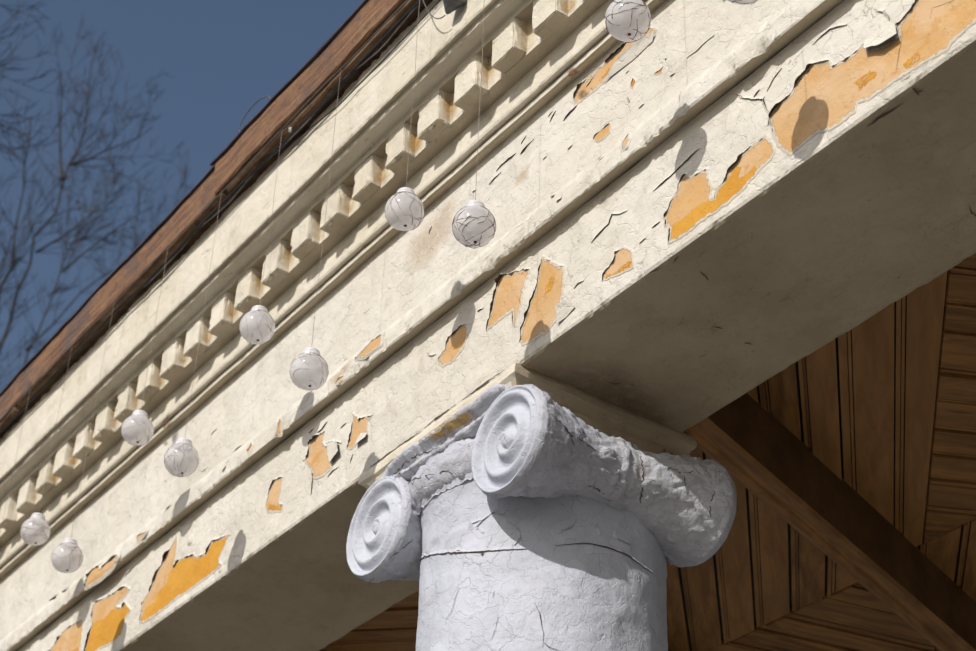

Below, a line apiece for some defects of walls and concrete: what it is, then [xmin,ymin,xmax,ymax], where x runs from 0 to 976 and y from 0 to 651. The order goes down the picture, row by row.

peeling [572,26,658,107]
crack [733,68,781,125]
peeling [662,0,976,245]
crack [812,22,847,45]
crack [653,148,699,191]
crack [591,209,627,242]
peeling [486,254,575,347]
peeling [438,322,469,368]
peeling [303,412,374,480]
crack [309,370,504,492]
crack [389,509,526,560]
peeling [48,533,230,651]